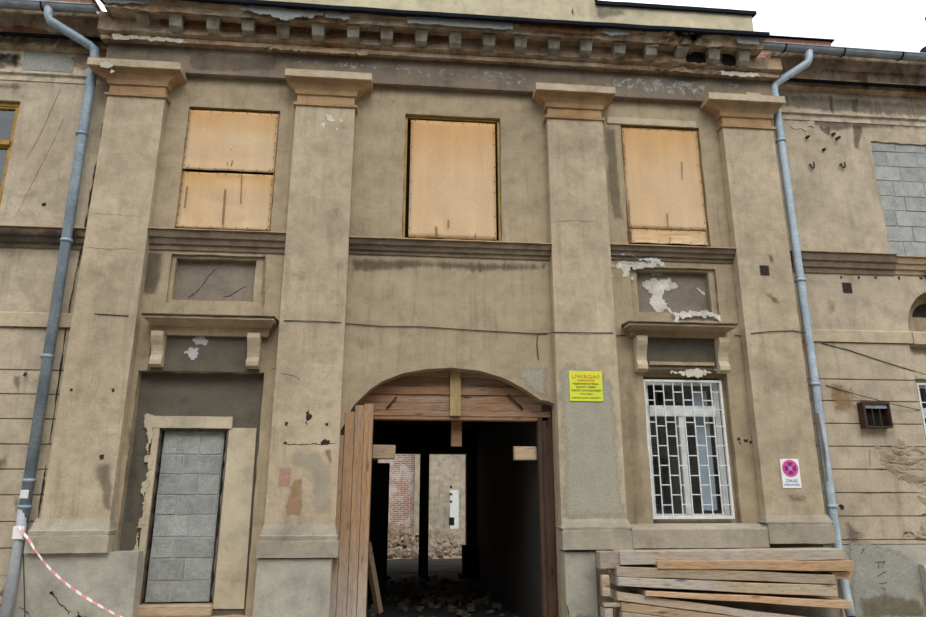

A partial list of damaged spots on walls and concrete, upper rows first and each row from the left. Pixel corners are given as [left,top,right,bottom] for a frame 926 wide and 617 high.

spalling [268,45,378,70]
peeling [396,67,525,85]
peeling [606,77,705,95]
peeling [611,253,721,322]
peeling [184,336,209,360]
spalling [670,368,717,378]
peeling [132,413,155,551]
spalling [874,438,926,540]